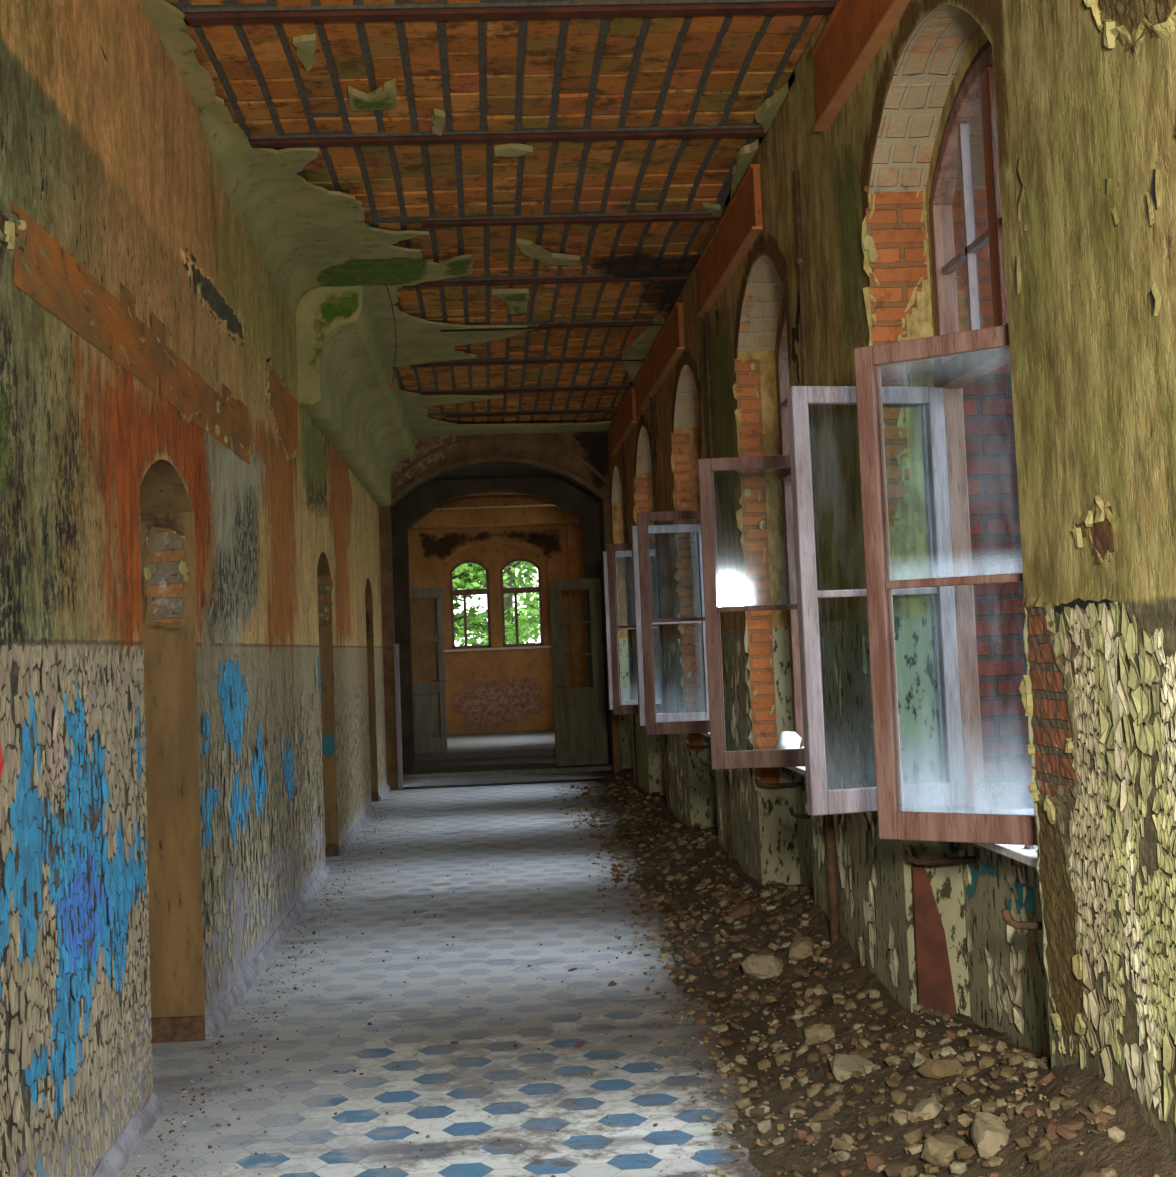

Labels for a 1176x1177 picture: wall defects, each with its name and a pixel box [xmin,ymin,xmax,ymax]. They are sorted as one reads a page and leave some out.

flaking render [1082,0,1176,55]
flaking render [0,198,252,465]
flaking render [165,0,826,485]
damp [0,313,83,660]
flaking render [141,525,193,630]
damp [201,432,266,656]
peeling [0,644,153,1177]
peeling [201,656,325,1001]
flaking render [719,767,783,842]
flaking render [812,811,899,987]
flaking render [959,593,1176,1126]